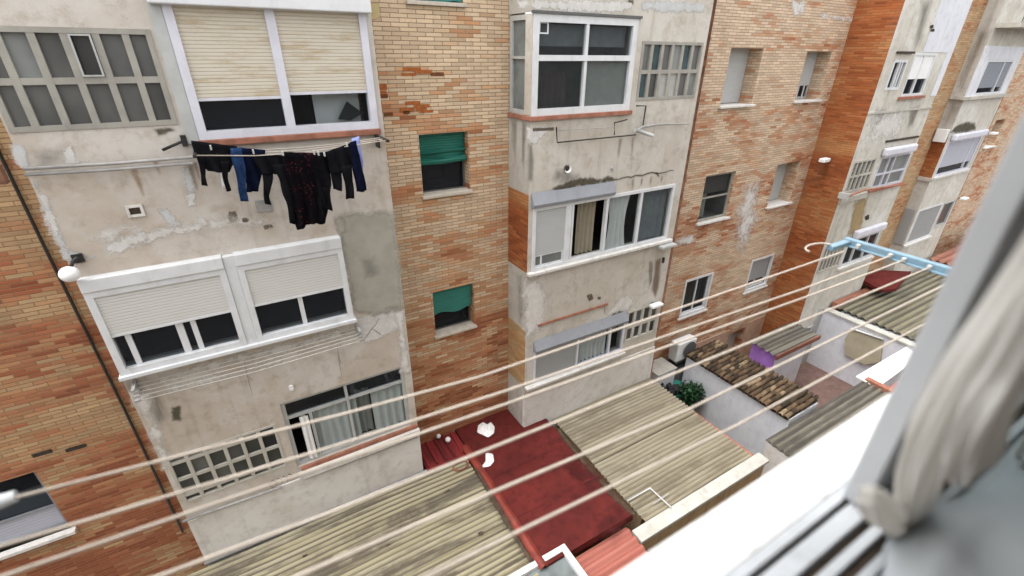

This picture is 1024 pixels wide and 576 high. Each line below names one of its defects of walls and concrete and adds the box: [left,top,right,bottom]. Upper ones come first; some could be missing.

peeling [517,0,705,13]
peeling [11,144,29,168]
crack [609,170,674,181]
peeling [35,183,93,260]
peeling [94,168,273,254]